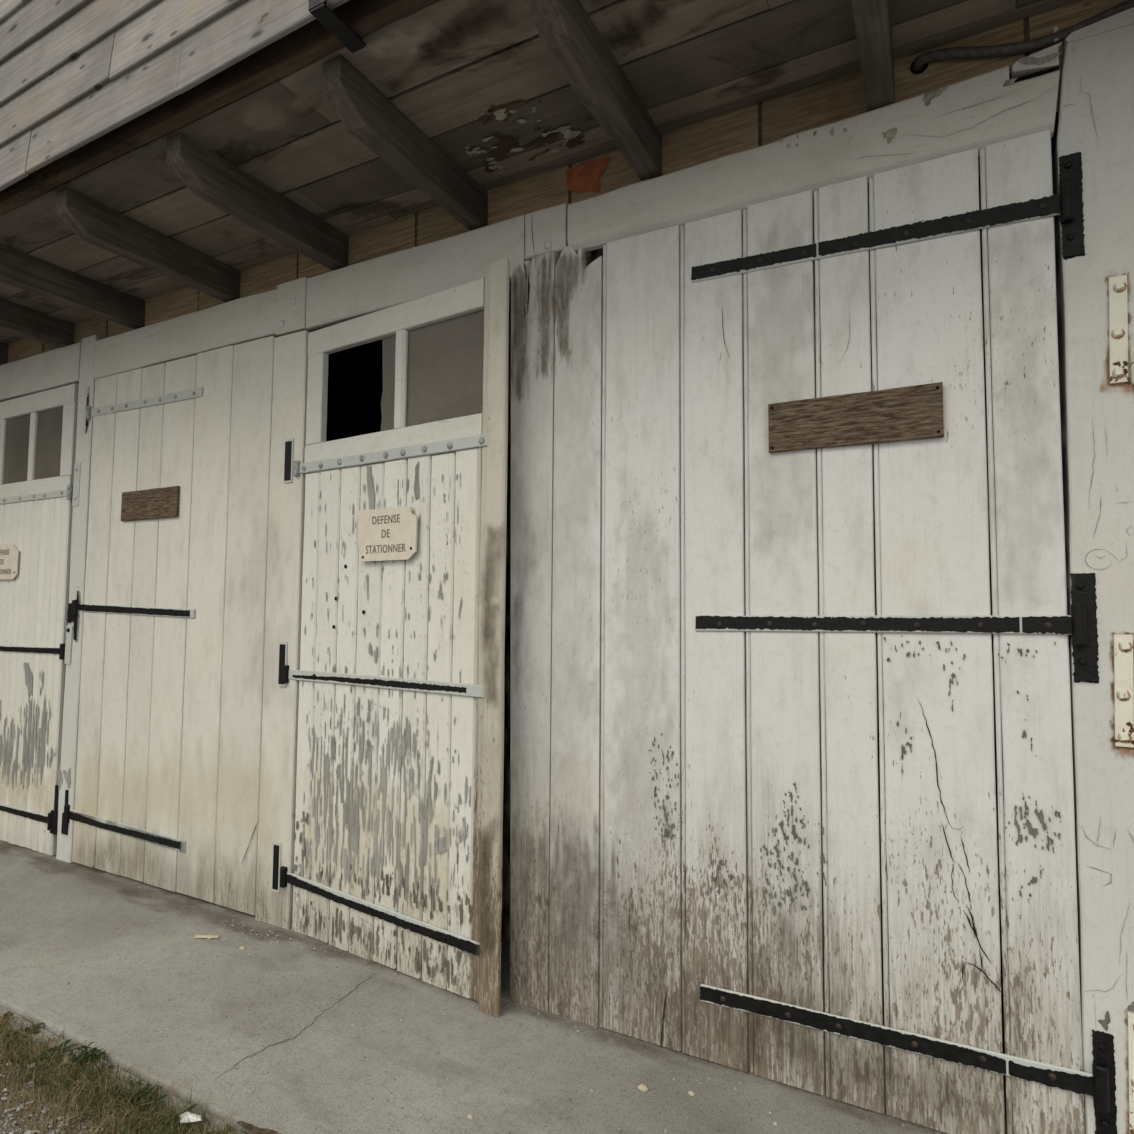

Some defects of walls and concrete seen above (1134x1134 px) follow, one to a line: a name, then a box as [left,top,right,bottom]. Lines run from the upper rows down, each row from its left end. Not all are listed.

rust [1101,274,1134,391]
peeling [314,462,428,558]
peeling [402,550,462,640]
peeling [884,635,966,712]
rust [1111,632,1134,701]
peeling [293,624,474,927]
rust [1111,718,1134,752]
peeling [759,782,828,916]
crack [917,698,1004,995]
peeling [1005,796,1061,853]
peeling [302,901,460,988]
crack [216,973,377,1079]